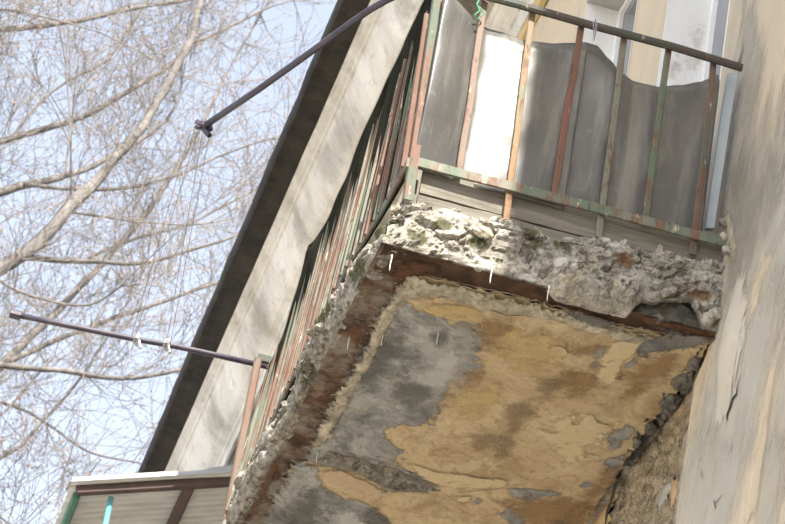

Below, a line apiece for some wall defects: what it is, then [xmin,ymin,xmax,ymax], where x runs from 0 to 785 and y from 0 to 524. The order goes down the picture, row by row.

corrosion [388,260,435,293]
damp [363,325,467,410]
spalling [221,202,736,524]
crack [726,374,742,420]
crack [605,435,660,524]